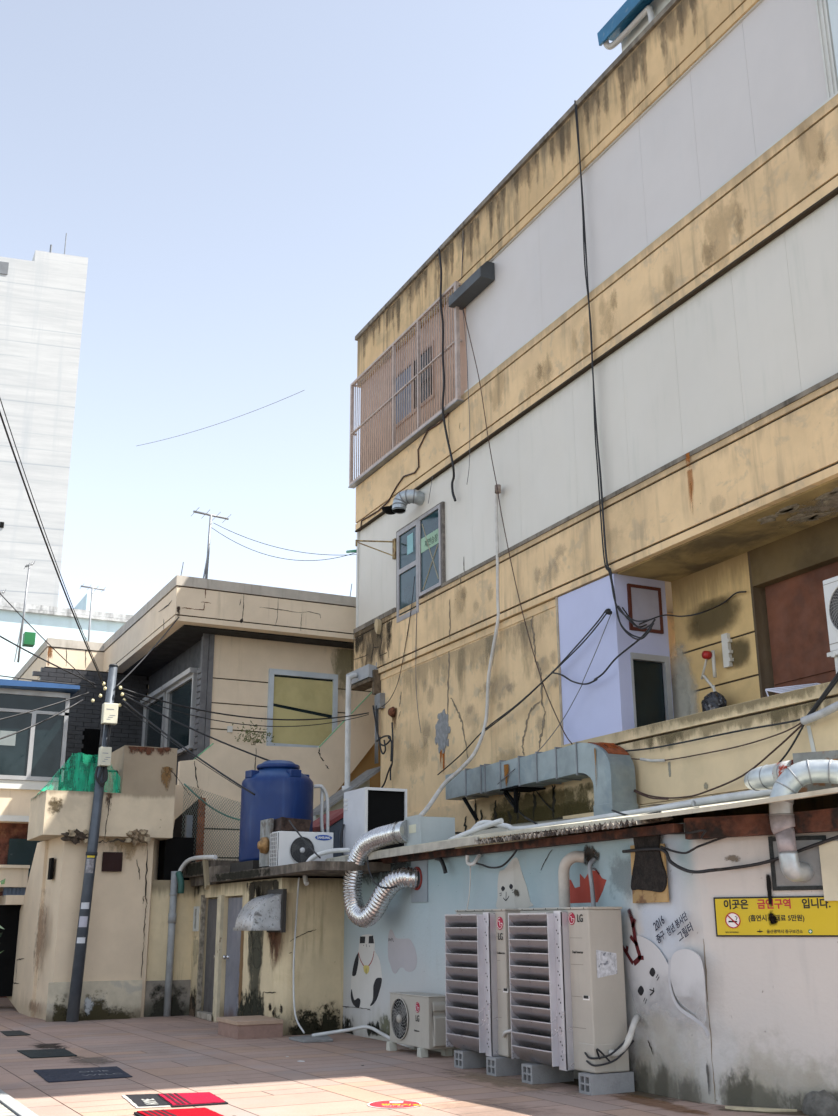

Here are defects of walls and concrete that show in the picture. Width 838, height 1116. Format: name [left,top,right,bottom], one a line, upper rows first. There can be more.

spalling [435,709,451,754]
spalling [61,829,89,845]
spalling [125,829,152,846]
leakage [34,910,46,968]
leakage [237,931,280,1019]
leakage [53,995,133,1022]
leakage [148,985,196,1017]
leakage [289,1003,353,1035]
leakage [367,1015,390,1036]